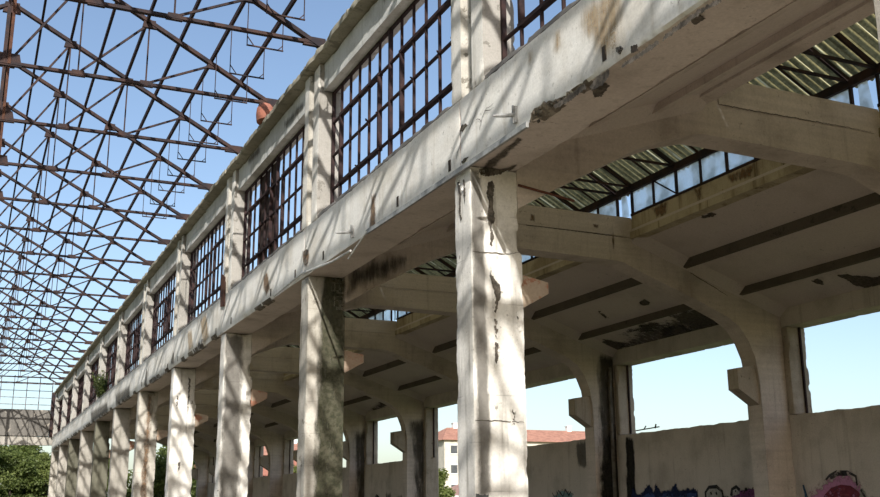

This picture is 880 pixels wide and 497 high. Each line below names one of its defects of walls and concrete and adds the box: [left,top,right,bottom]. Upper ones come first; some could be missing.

spalling [530,0,722,123]
peeling [479,139,521,246]
water stain [313,259,402,497]
peeling [490,265,504,368]
water stain [599,310,719,497]
peeling [835,273,880,288]